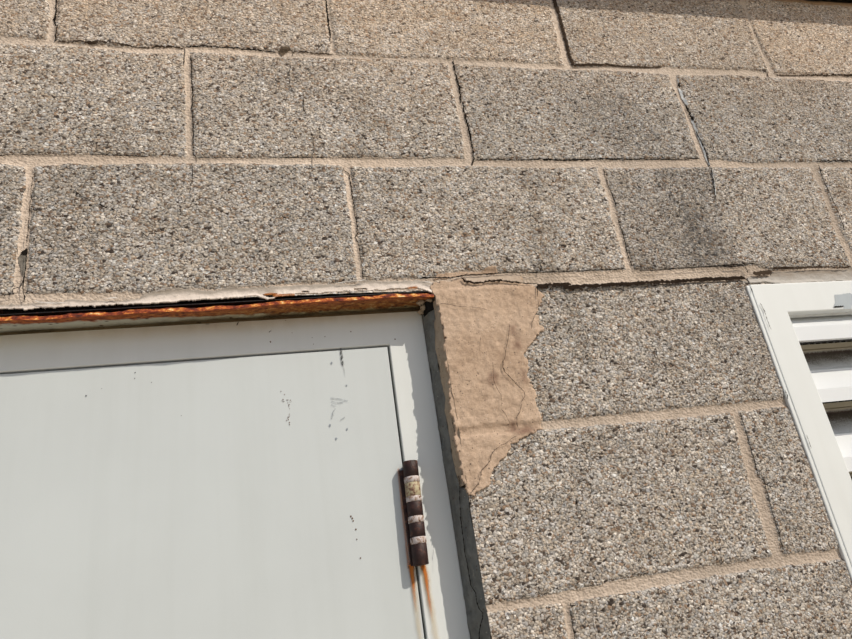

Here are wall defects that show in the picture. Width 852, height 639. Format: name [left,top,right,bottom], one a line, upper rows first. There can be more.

crack [553,0,662,68]
crack [421,60,852,328]
spalling [18,248,28,280]
peeling [464,274,522,283]
peeling [834,293,852,309]
rust [398,469,431,606]
crack [458,324,525,639]
crack [740,412,783,548]